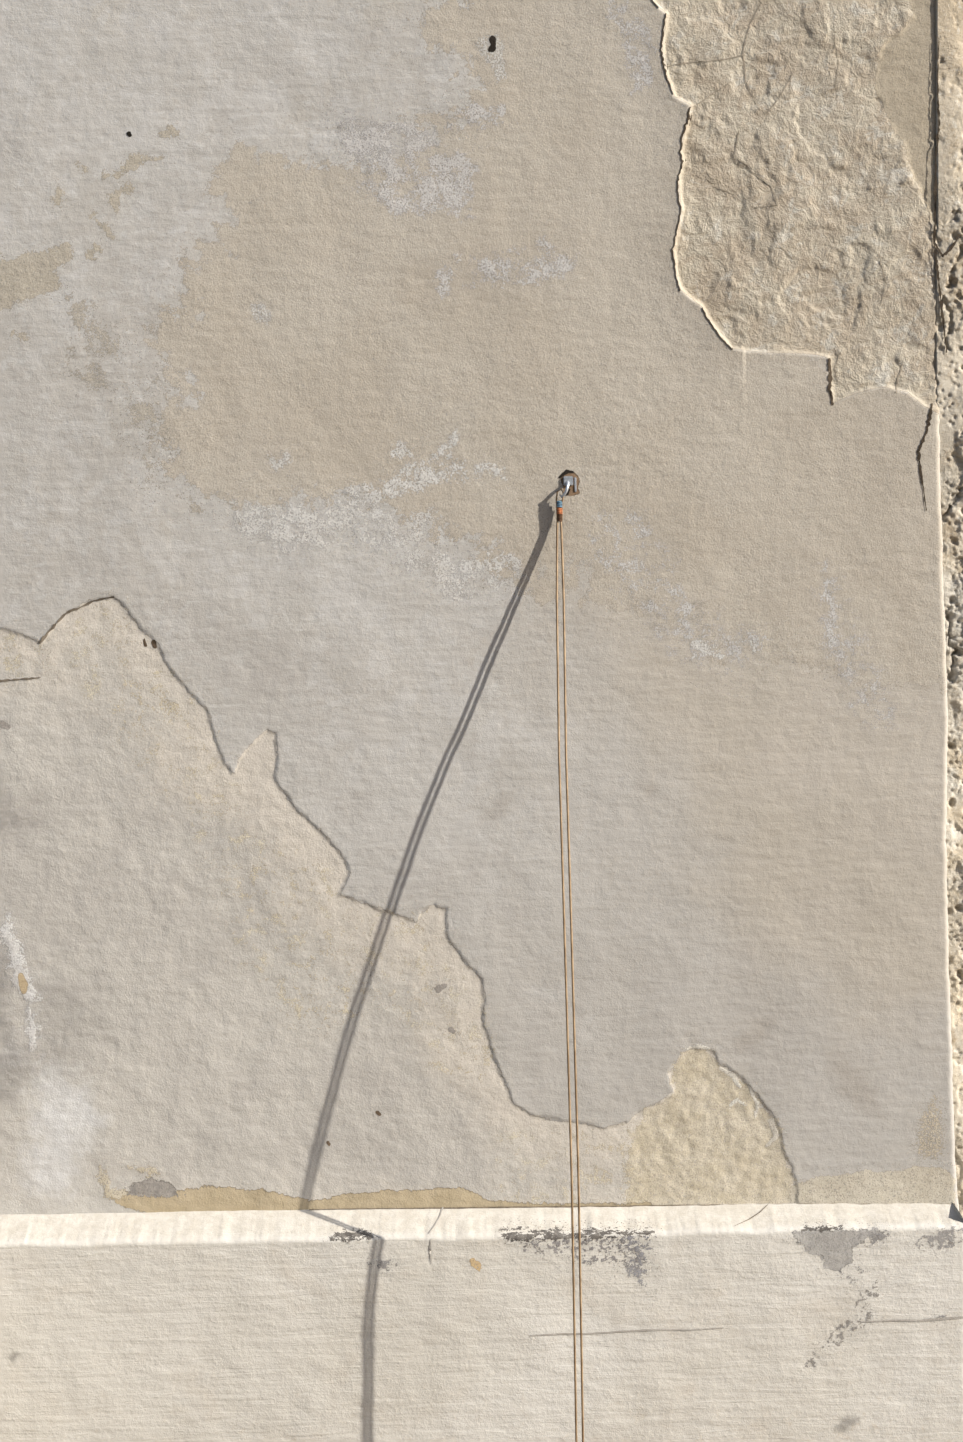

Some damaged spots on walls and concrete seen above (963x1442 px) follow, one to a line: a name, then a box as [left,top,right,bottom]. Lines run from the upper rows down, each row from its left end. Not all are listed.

crack [652,0,733,349]
peeling [0,124,180,391]
crack [917,403,933,510]
leakage [523,1235,652,1287]
peeling [792,1222,889,1283]
peeling [914,1226,963,1251]